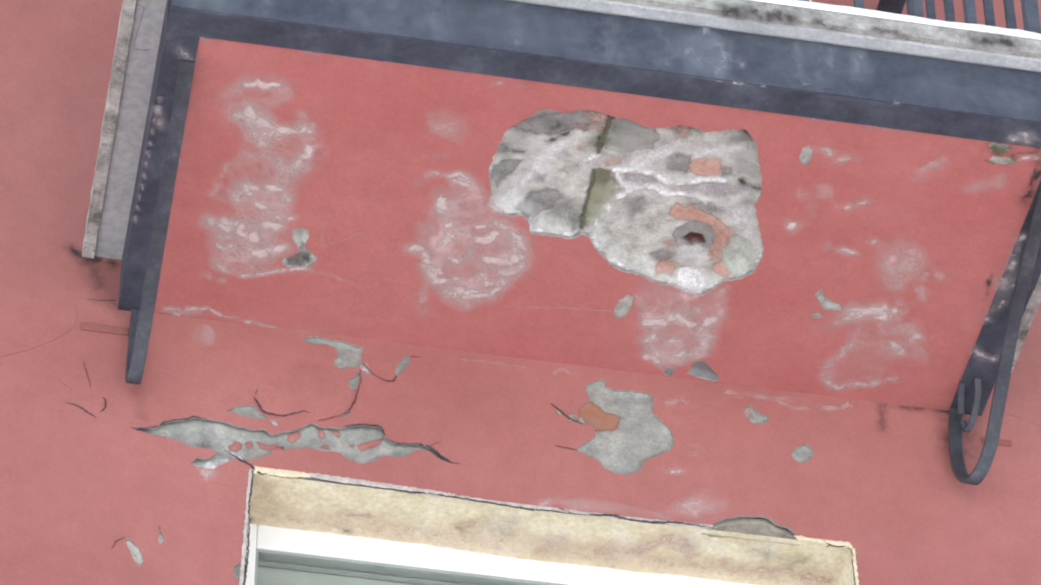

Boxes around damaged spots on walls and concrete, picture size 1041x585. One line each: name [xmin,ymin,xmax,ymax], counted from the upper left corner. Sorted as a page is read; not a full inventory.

leakage [236,79,287,95]
leakage [207,105,316,278]
flaking render [282,228,317,266]
leakage [408,172,527,310]
spalling [487,109,764,296]
flaking render [304,338,368,391]
crack [253,356,460,464]
flaking render [556,380,674,476]
leakage [637,288,726,366]
flaking render [125,541,143,567]
crack [131,416,712,585]
flaking render [136,406,859,585]